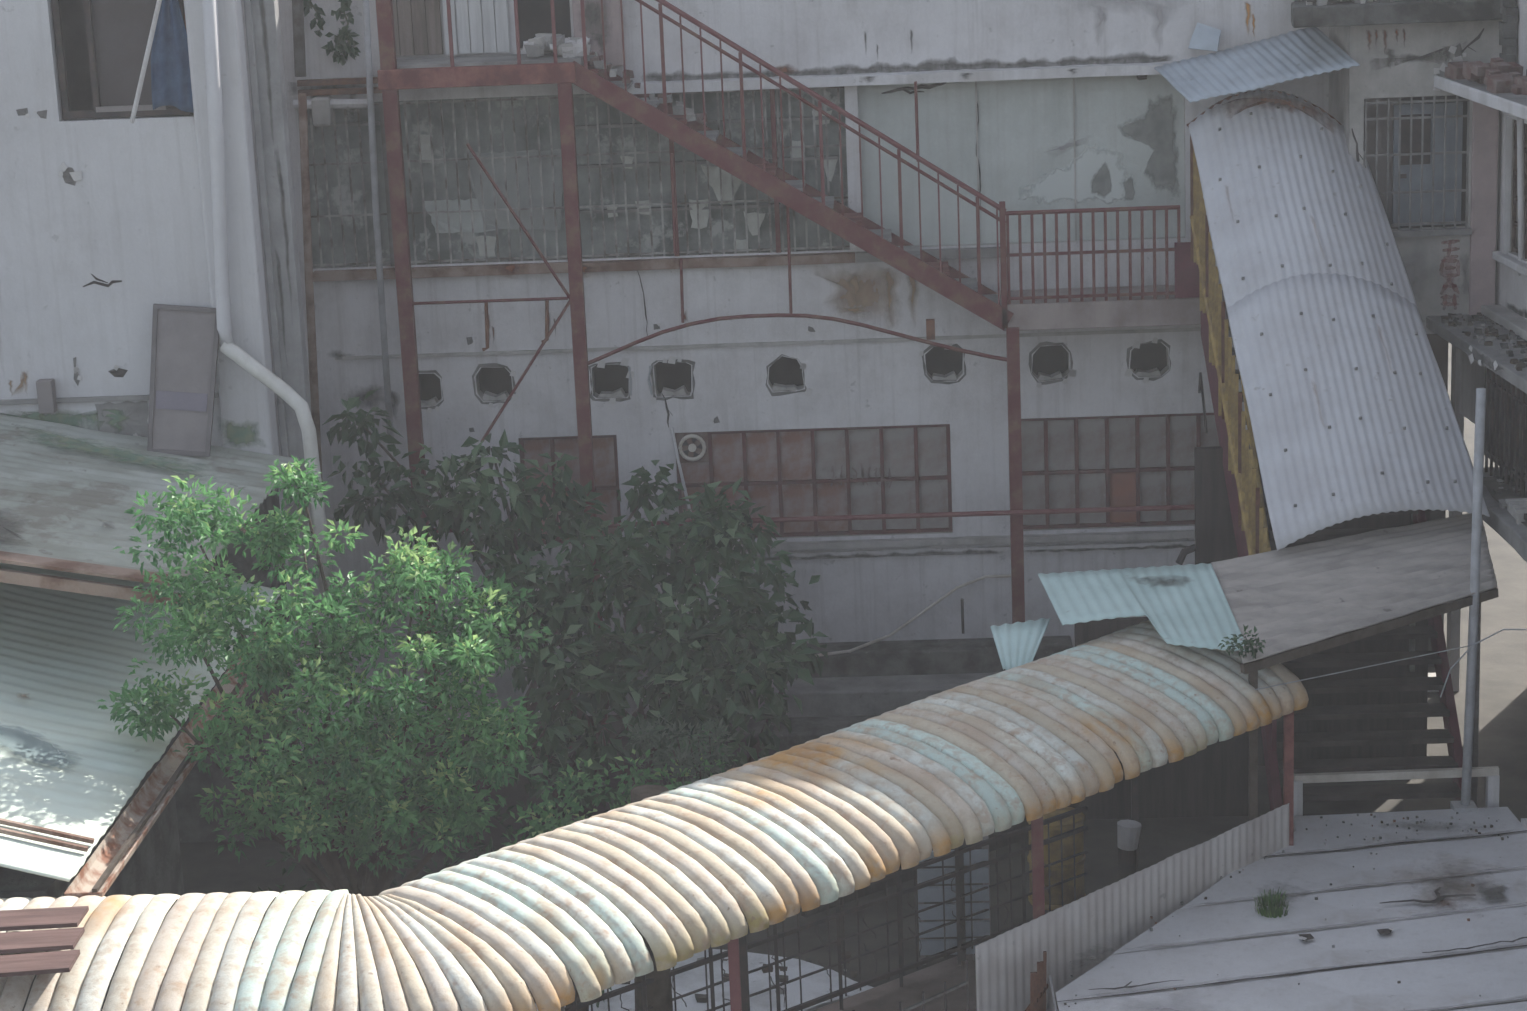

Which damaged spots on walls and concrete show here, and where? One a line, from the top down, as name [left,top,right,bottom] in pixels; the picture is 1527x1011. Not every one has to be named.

spalling [58,161,82,186]
peeling [1021,142,1126,204]
leakage [1481,885,1506,902]